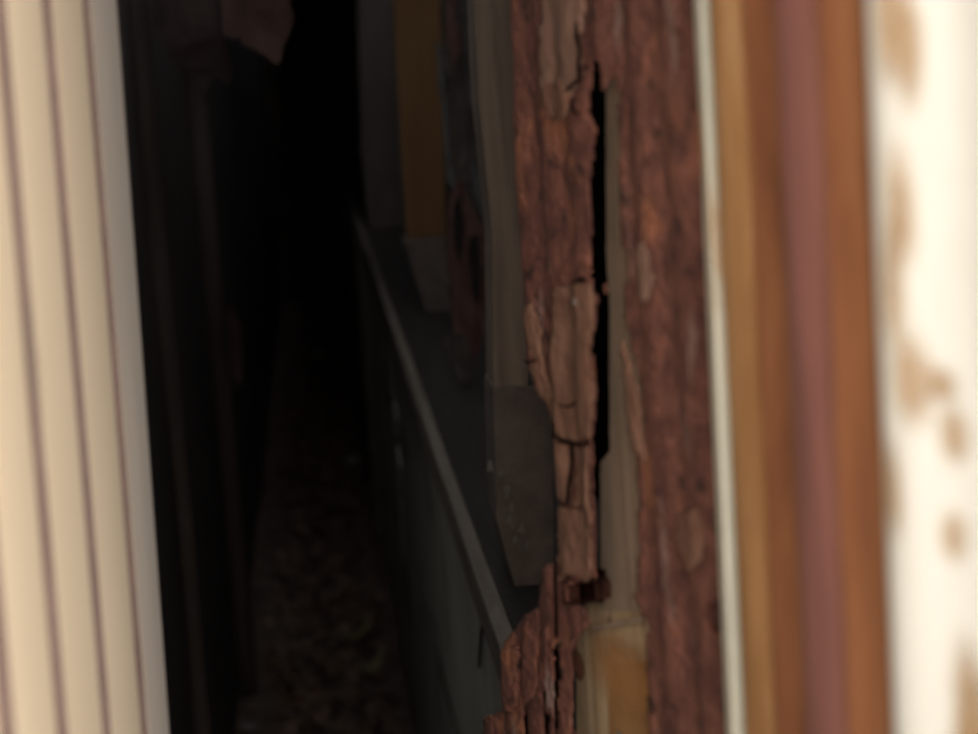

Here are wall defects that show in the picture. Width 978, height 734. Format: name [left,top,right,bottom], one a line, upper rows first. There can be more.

crack [564,22,589,115]
crack [569,276,587,284]
spalling [588,61,610,503]
crack [551,435,585,505]